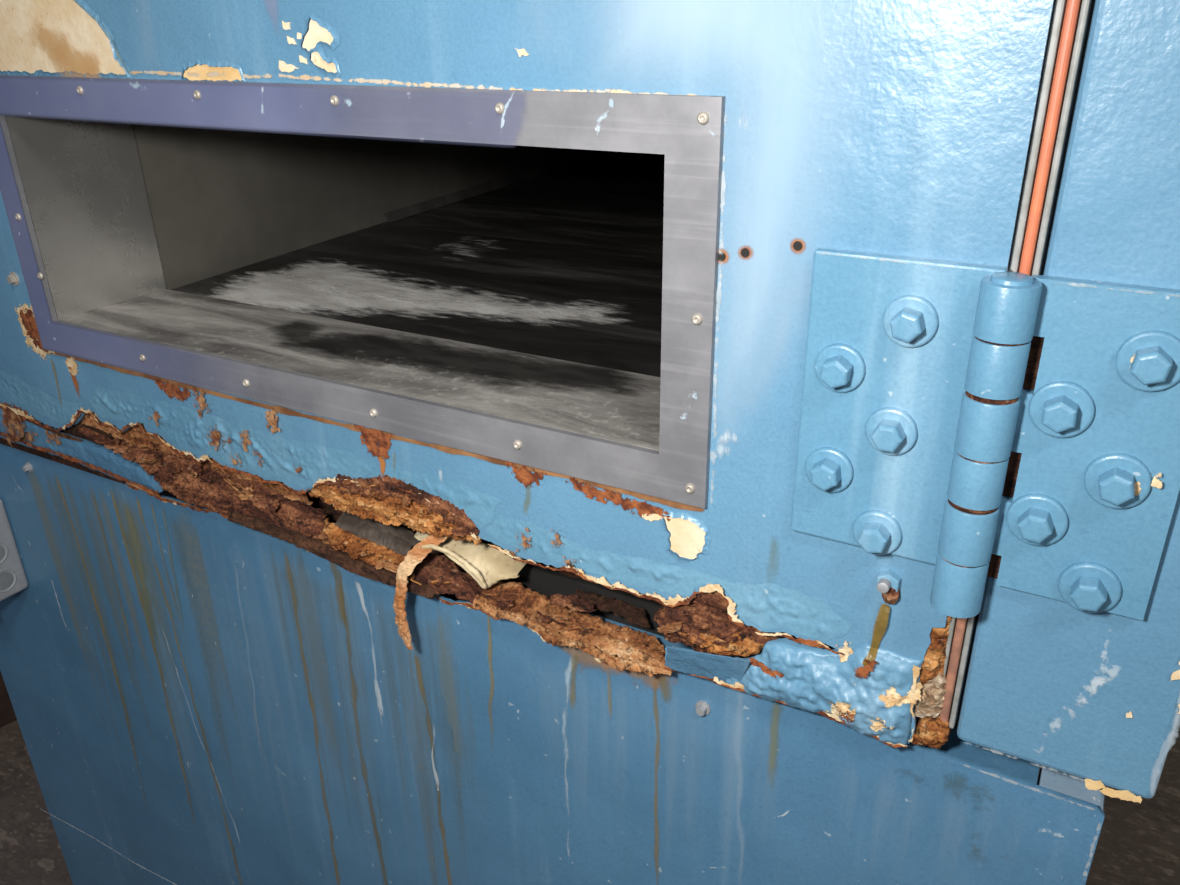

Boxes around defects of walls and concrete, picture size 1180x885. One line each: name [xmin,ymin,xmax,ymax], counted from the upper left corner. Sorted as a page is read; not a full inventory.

peeling [0,0,133,79]
peeling [180,58,246,82]
peeling [279,13,341,79]
peeling [642,509,712,563]
corrosion [0,303,847,885]
damp [356,582,383,714]
corrosion [854,604,890,679]
corrosion [866,616,952,749]
damp [563,655,575,797]